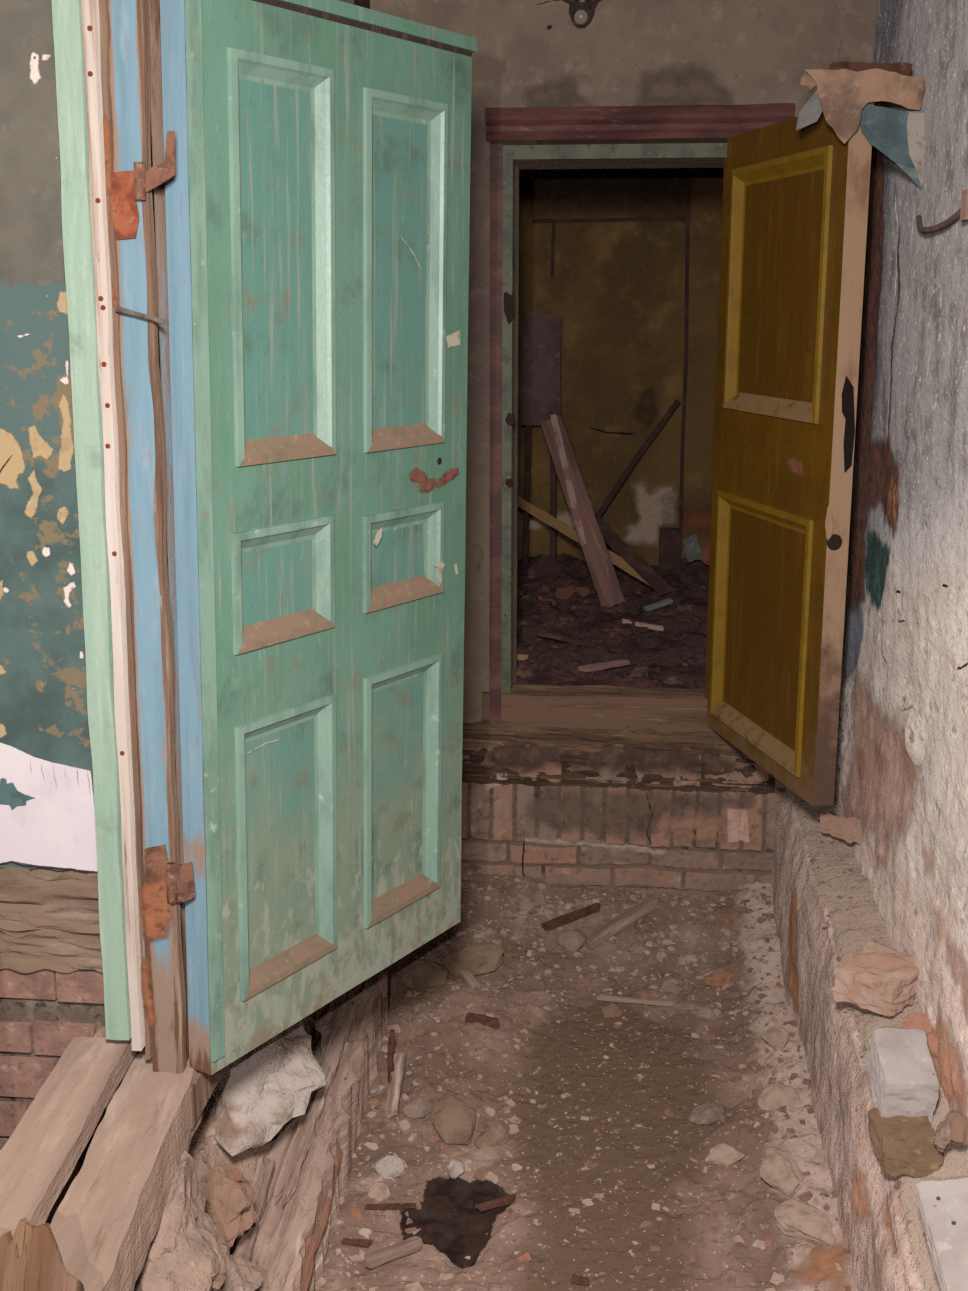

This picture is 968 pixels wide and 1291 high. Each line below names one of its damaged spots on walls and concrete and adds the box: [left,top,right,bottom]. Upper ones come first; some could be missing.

flaking render [30,52,50,84]
peeling [57,292,68,315]
peeling [0,361,74,519]
peeling [57,507,68,524]
peeling [26,547,50,566]
peeling [64,562,76,608]
peeling [0,724,103,973]
corrosion [141,877,172,941]
corrosion [141,959,156,1027]